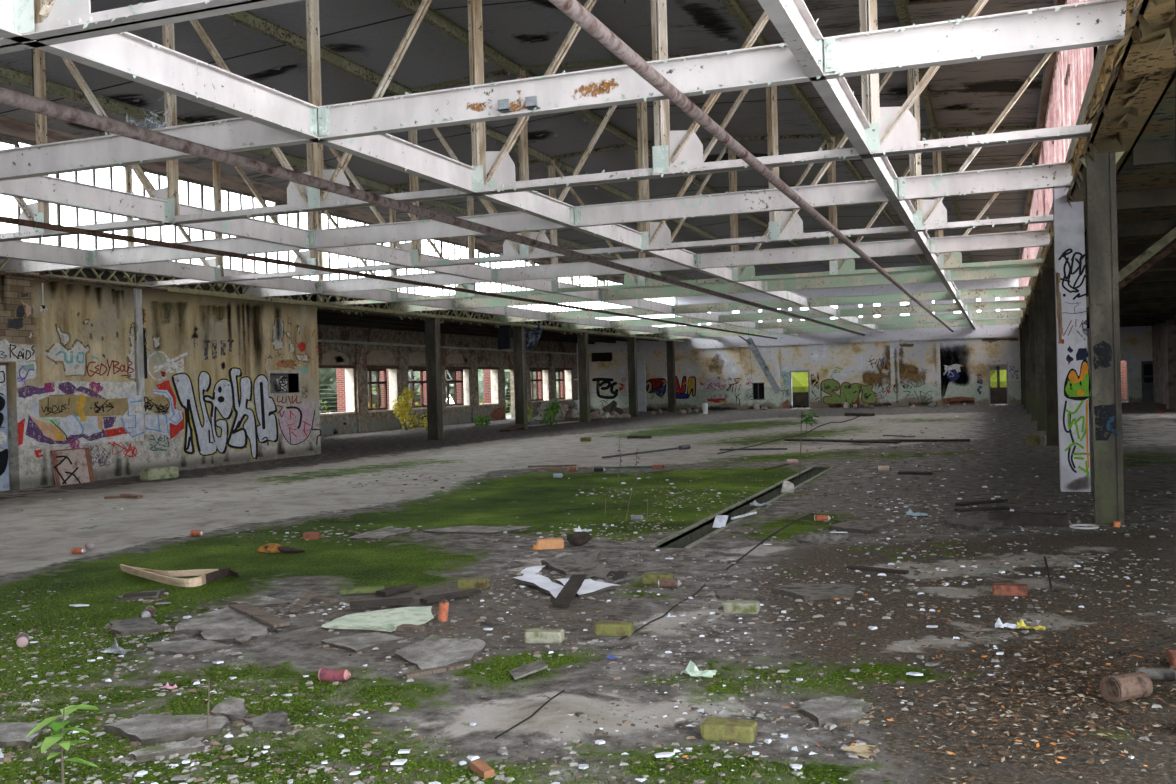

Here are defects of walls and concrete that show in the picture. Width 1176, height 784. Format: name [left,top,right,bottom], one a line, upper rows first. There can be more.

water stain [674,0,735,41]
rust [574,79,619,98]
water stain [153,302,186,349]
water stain [205,303,261,363]
water stain [829,346,975,408]